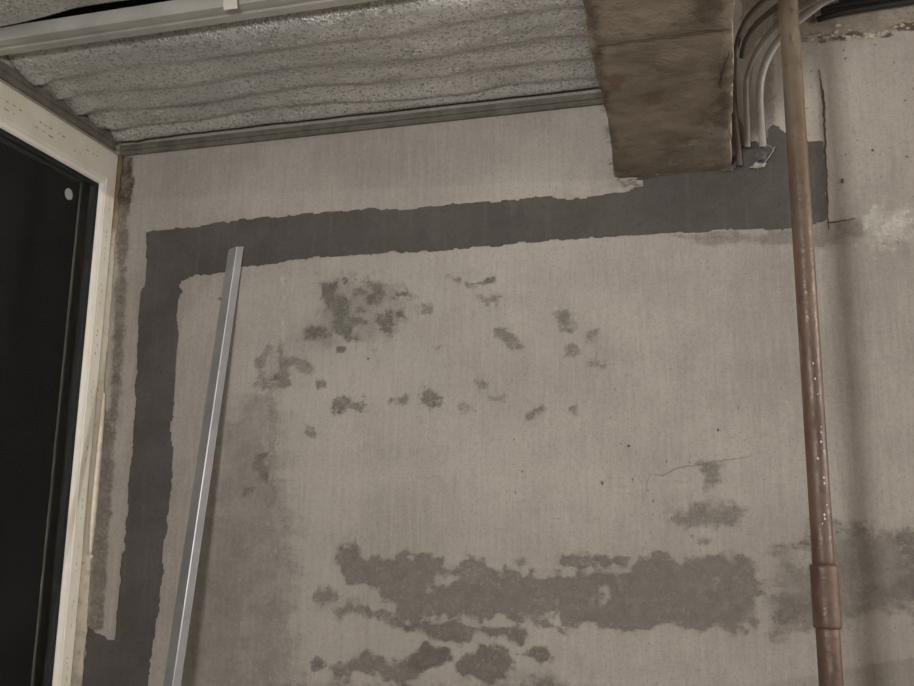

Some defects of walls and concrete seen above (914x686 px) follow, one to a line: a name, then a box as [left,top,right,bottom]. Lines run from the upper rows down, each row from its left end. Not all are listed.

spalling [741,0,780,56]
spalling [798,0,914,59]
damp [861,205,914,250]
damp [306,278,403,353]
damp [89,201,129,630]
damp [311,544,761,686]